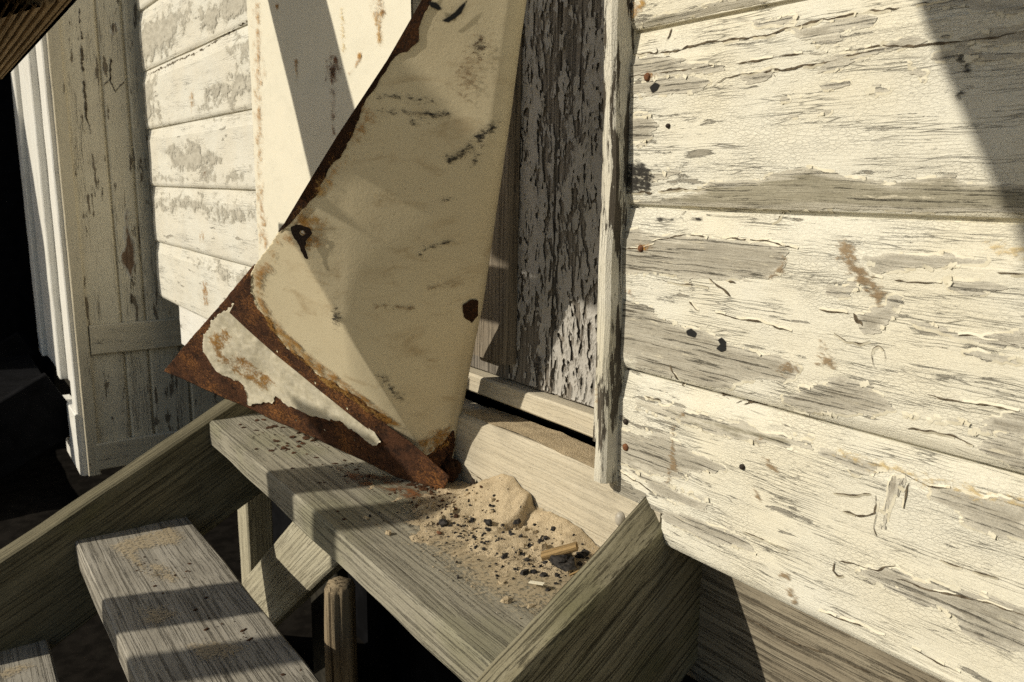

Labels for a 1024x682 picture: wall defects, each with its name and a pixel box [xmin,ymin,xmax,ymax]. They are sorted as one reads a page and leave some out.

crack [630,0,1024,82]
peeling [629,54,725,149]
rust [229,0,431,448]
peeling [508,0,604,407]
peeling [622,227,789,283]
peeling [628,165,1024,215]
rust [210,330,271,391]
peeling [620,292,1024,470]
rust [419,427,456,469]
peeling [618,396,906,555]
crack [834,470,950,535]
peeling [855,564,1024,655]